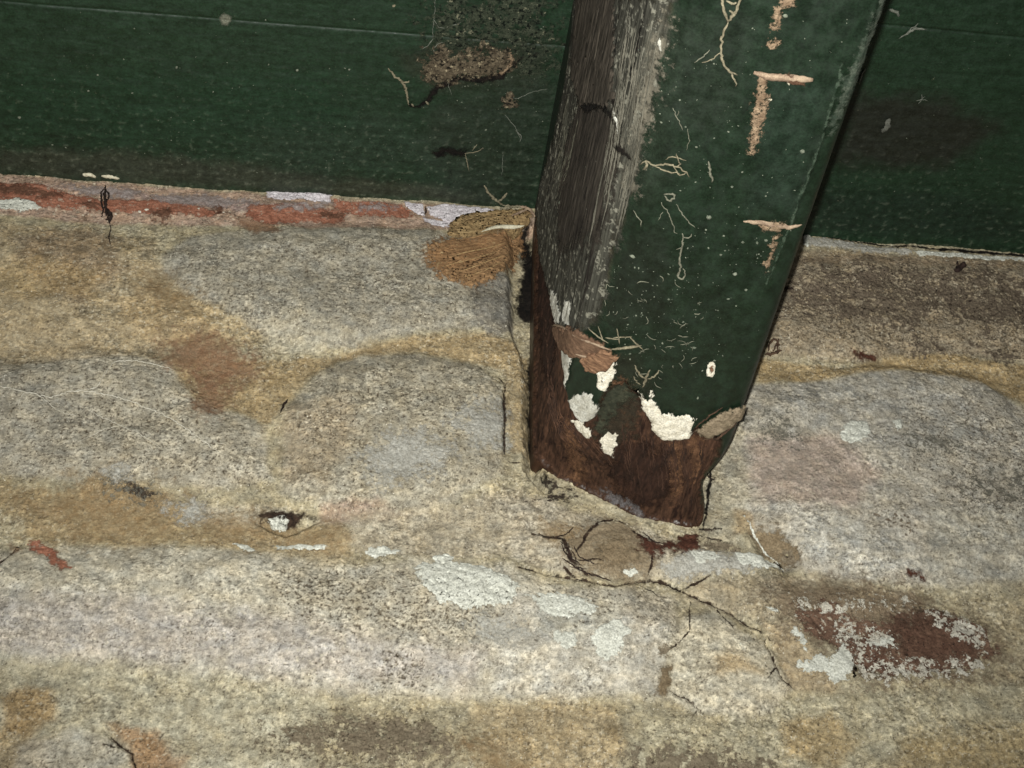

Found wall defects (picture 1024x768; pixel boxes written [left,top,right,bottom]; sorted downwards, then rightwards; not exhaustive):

peeling [550,289,571,325]
peeling [561,351,618,456]
peeling [639,390,746,441]
crack [518,566,792,688]